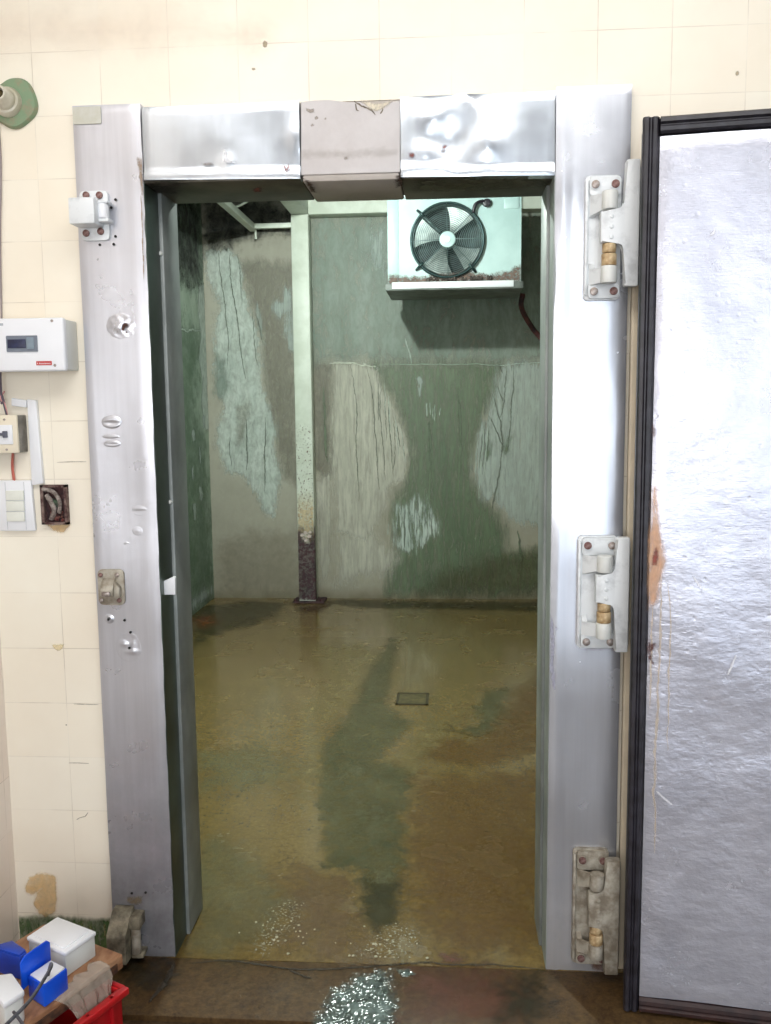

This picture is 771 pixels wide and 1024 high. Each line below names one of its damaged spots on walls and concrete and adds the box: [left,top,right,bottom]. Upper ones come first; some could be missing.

flaking render [301,100,404,202]
leakage [177,201,294,517]
corrosion [296,427,329,611]
leakage [311,214,541,598]
corrosion [648,489,671,758]
peeling [26,875,56,917]
leakage [316,638,415,925]